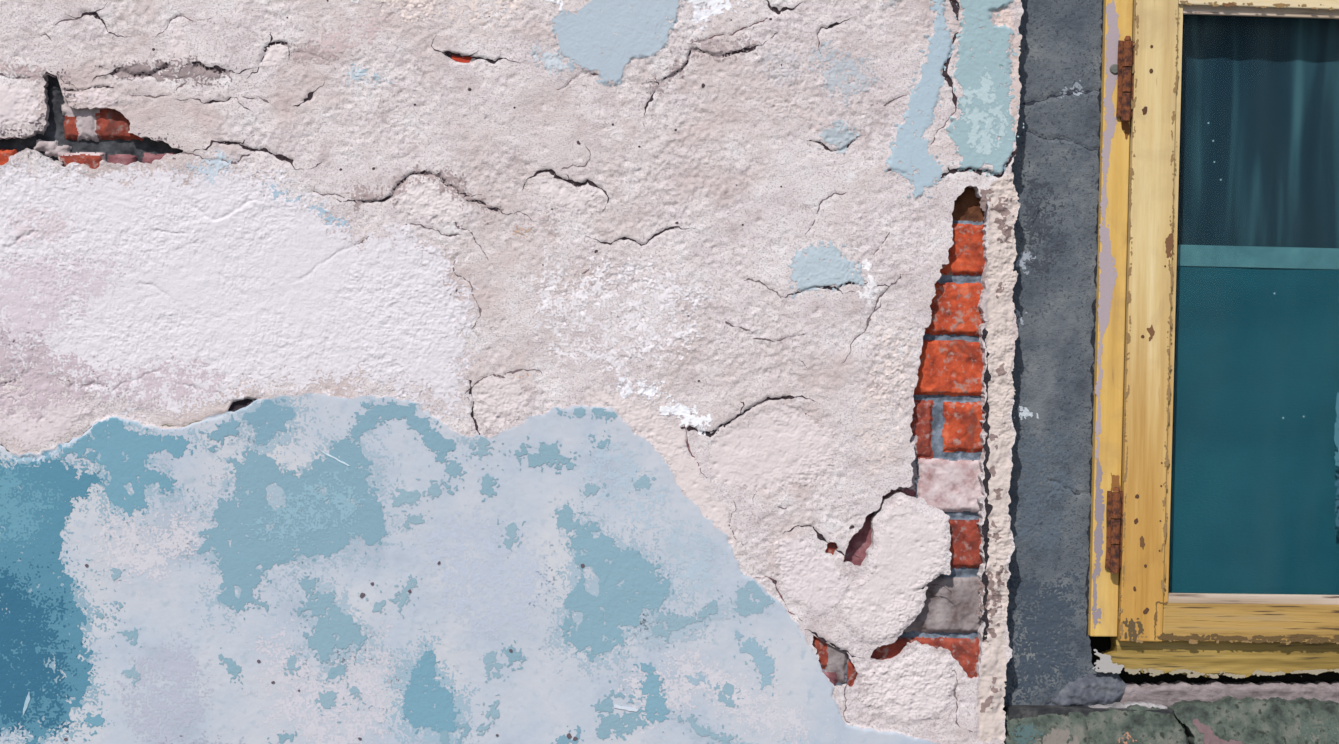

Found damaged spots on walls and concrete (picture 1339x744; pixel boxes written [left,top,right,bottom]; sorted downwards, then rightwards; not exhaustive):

flaking render [0,73,183,169]
crack [0,2,695,332]
peeling [552,0,688,86]
crack [643,0,850,127]
peeling [787,237,865,299]
crack [744,232,913,363]
crack [465,369,542,435]
crack [681,321,814,478]
flaking render [825,0,1024,743]
peeling [0,388,783,744]
flaking render [812,635,857,687]
peeling [1092,649,1339,679]